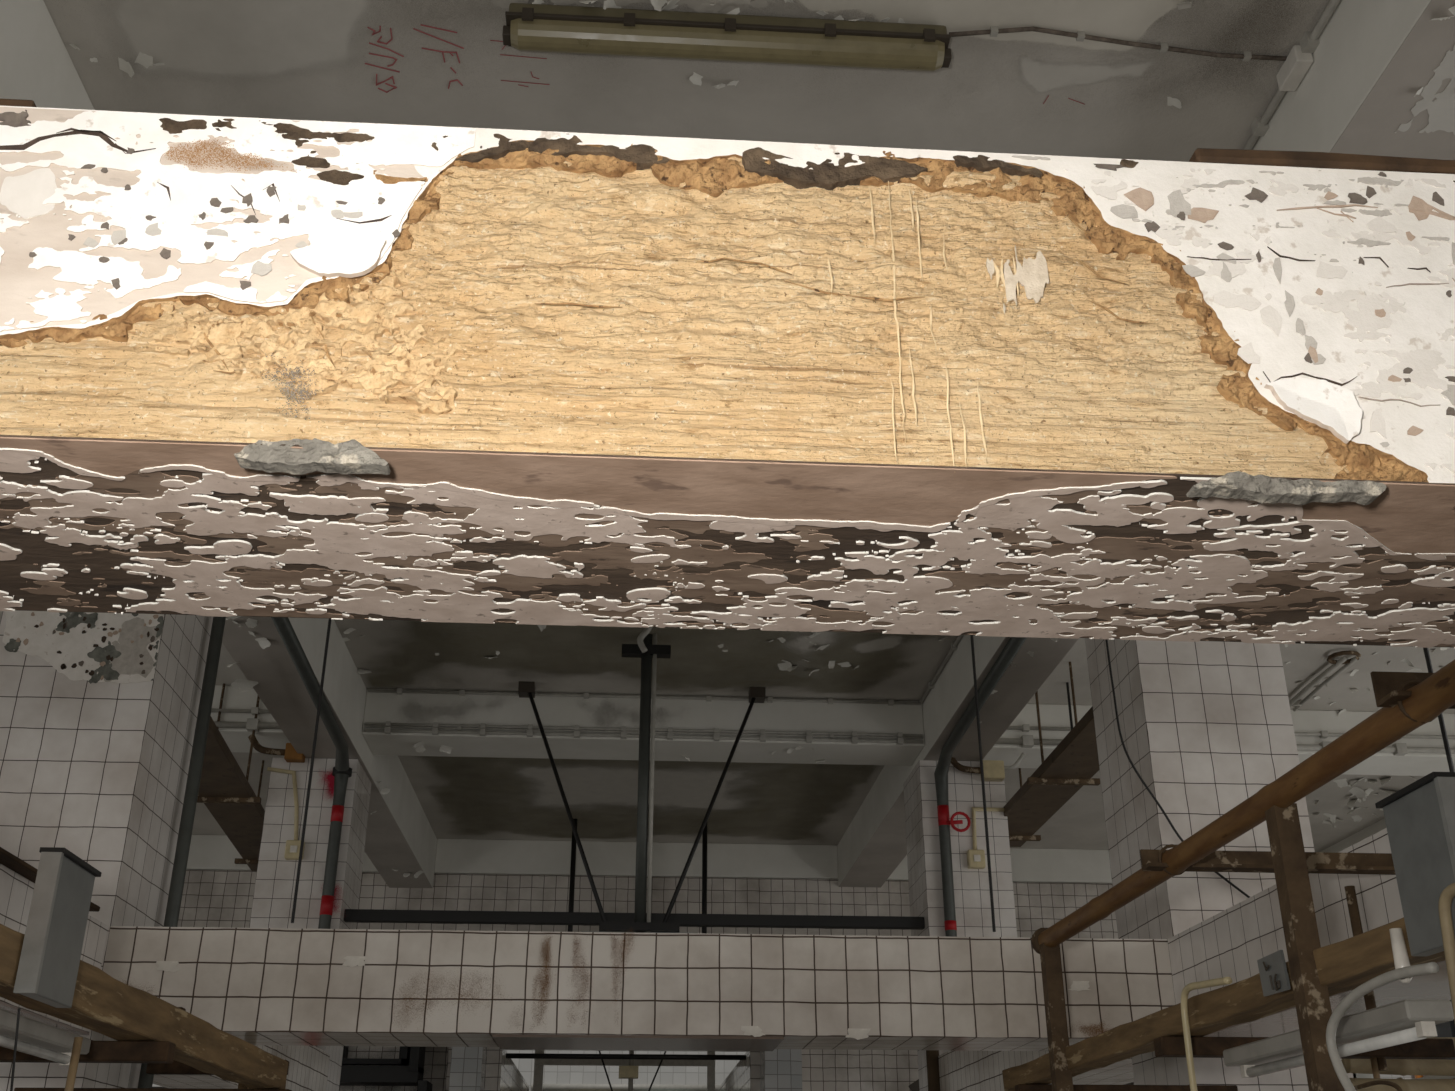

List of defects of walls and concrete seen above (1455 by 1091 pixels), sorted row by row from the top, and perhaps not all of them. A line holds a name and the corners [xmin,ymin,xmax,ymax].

peeling [118,52,164,78]
peeling [689,72,739,89]
leakage [280,0,1327,124]
peeling [492,0,1192,56]
peeling [1394,45,1455,135]
crack [0,128,171,201]
crack [231,183,280,215]
spalling [0,107,1455,716]